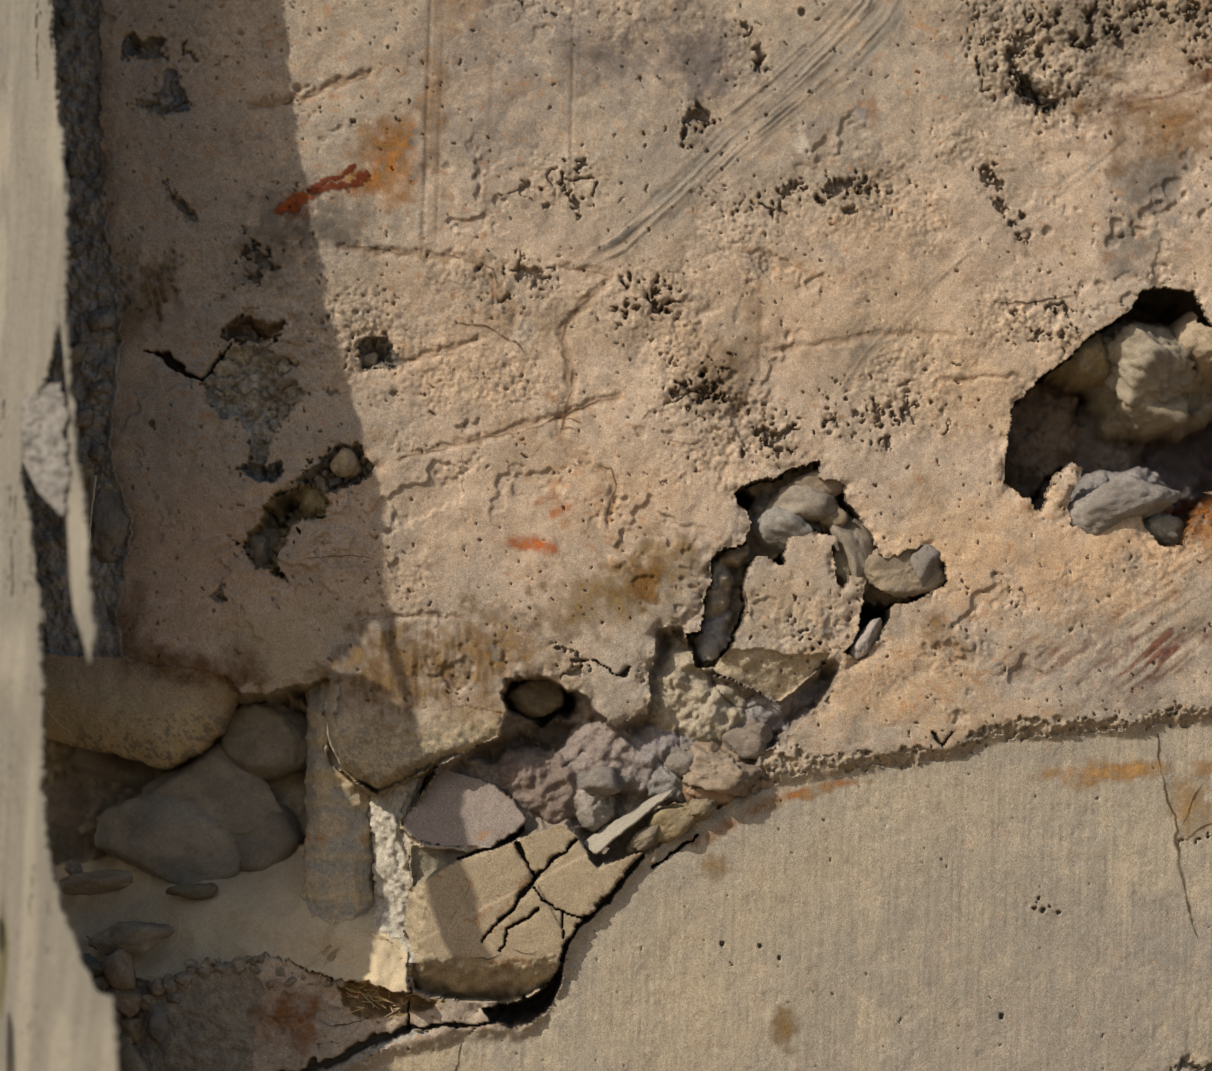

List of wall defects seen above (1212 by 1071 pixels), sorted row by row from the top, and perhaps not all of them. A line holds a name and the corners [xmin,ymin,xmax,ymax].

corrosion [275,120,413,214]
crack [149,349,229,382]
spalling [200,343,375,497]
flaking render [1101,320,1205,437]
flaking render [757,469,946,598]
peeling [403,768,528,849]
crack [458,827,699,964]
flaking render [582,721,773,854]
crack [1157,731,1212,939]
spalling [81,921,266,1071]
crack [281,1020,493,1071]
peeling [337,967,446,1020]